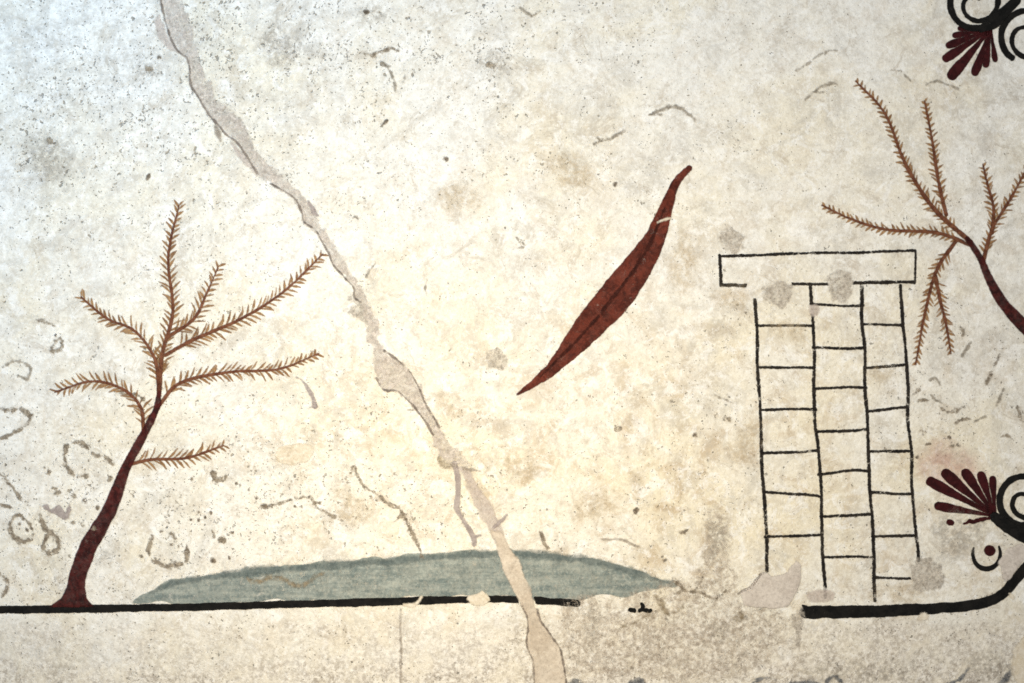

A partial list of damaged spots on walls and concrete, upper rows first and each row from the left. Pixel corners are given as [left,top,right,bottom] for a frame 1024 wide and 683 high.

crack [155,0,567,683]
peeling [467,591,490,605]
spalling [563,514,804,683]